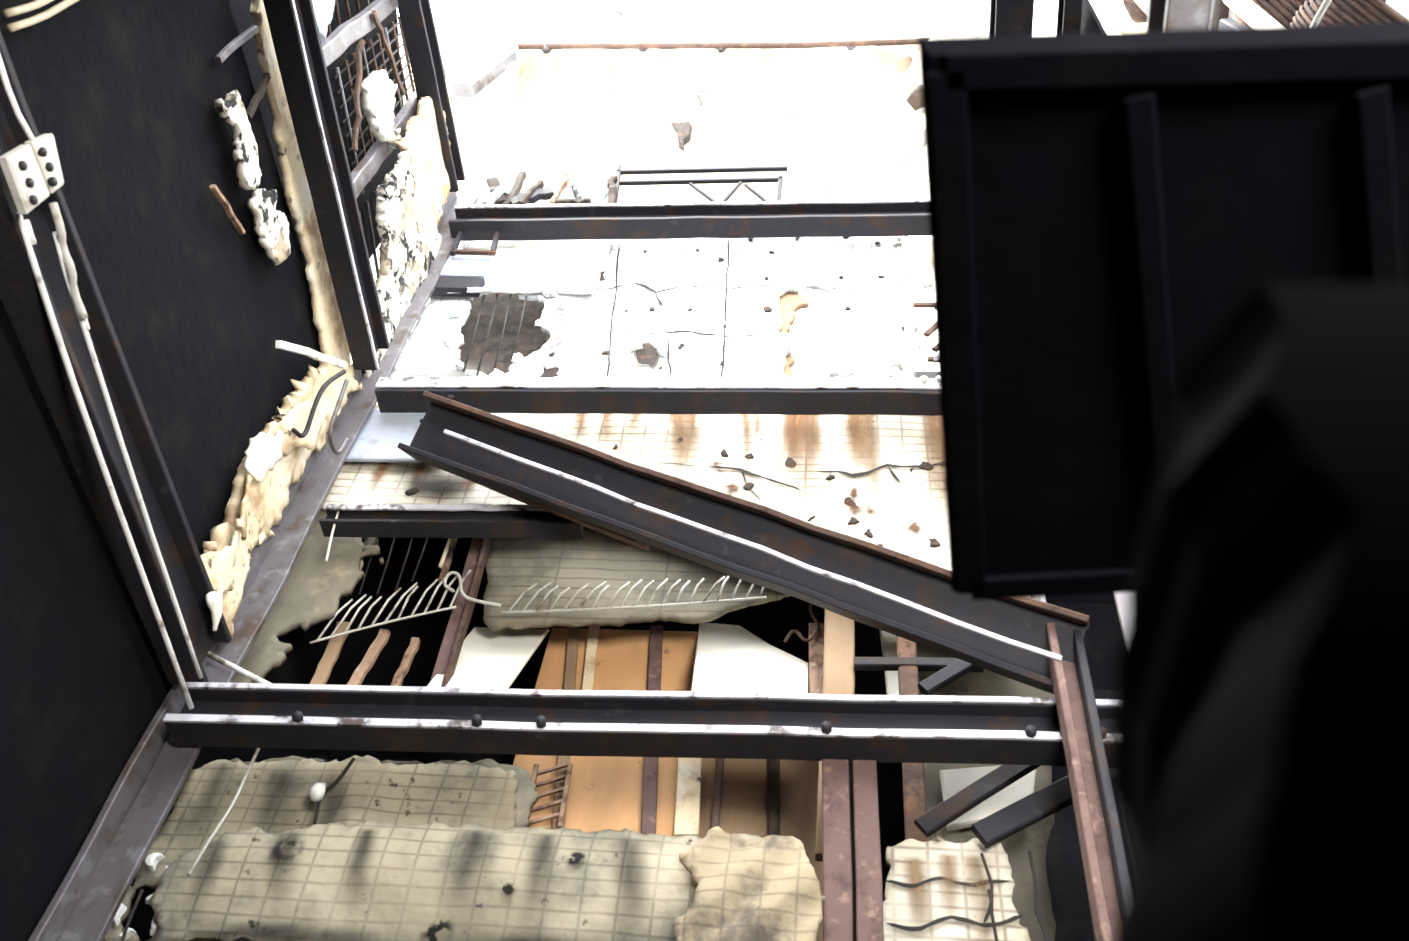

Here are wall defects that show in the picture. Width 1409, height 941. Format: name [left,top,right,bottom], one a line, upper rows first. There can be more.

peeling [488,353,524,377]
spalling [535,317,565,378]
corrosion [673,414,694,456]
corrosion [785,415,817,459]
corrosion [847,415,872,462]
corrosion [927,416,943,468]
corrosion [845,488,875,513]
leakage [355,830,373,868]
leakage [468,832,484,857]
leakage [535,835,553,873]
leakage [621,838,640,892]
leakage [229,925,361,941]